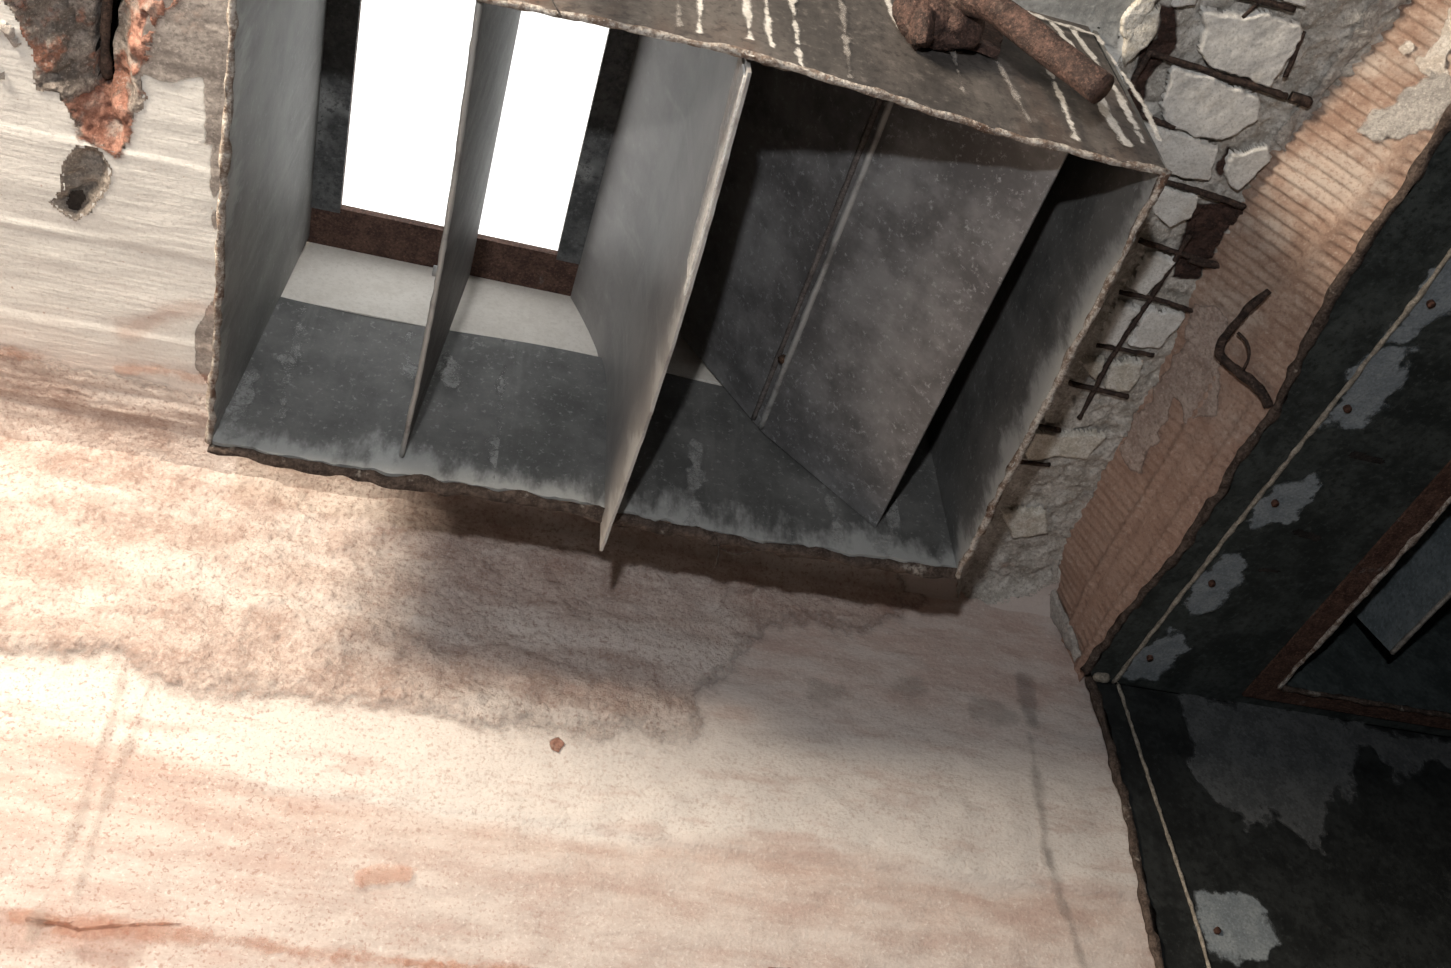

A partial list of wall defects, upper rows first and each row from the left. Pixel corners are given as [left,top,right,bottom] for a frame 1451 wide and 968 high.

spalling [0,0,229,230]
peeling [683,58,746,296]
spalling [956,0,1411,606]